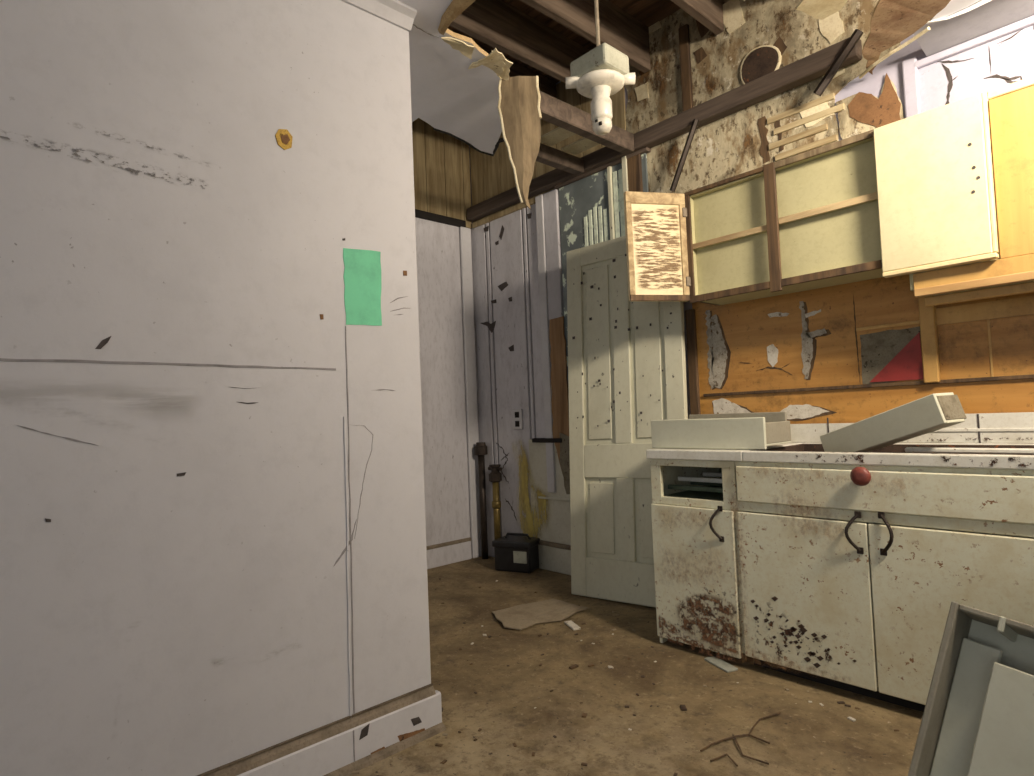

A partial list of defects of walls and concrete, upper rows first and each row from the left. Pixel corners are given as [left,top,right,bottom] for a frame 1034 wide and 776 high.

peeling [441,37,513,80]
flaking render [625,0,904,194]
crack [937,25,1034,105]
peeling [705,310,754,414]
peeling [767,301,831,380]